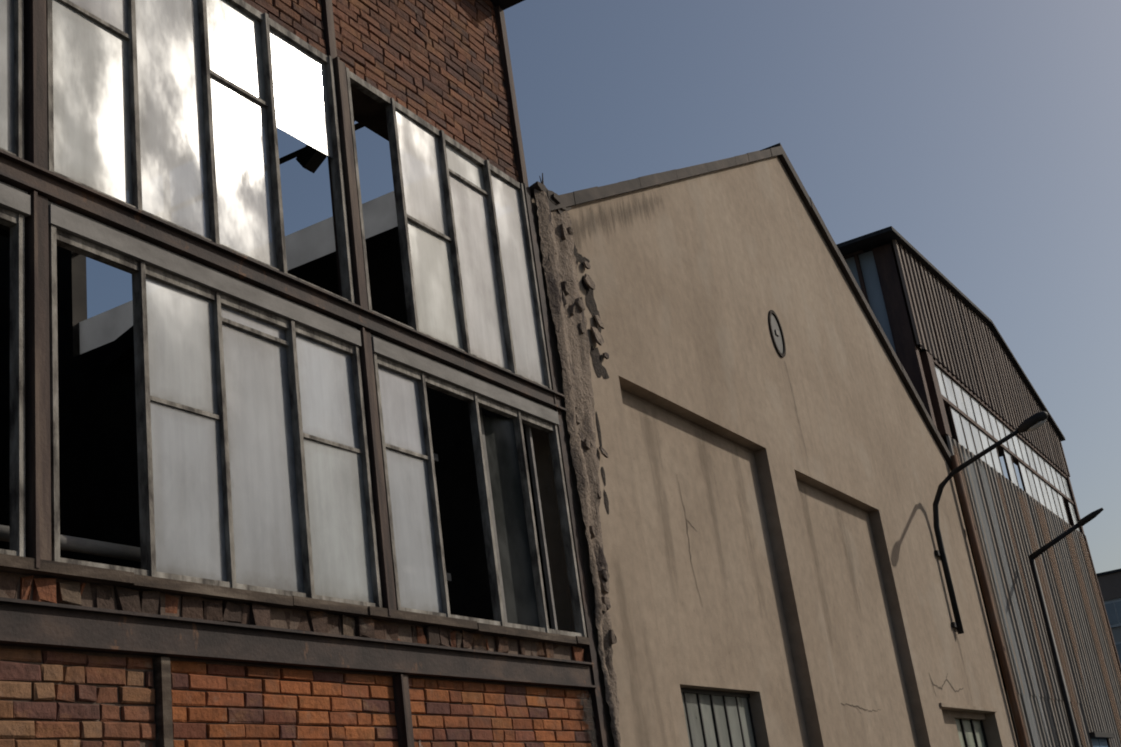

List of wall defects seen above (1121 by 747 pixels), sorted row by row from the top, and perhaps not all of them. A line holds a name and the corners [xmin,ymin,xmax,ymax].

flaking render [534,189,621,747]
crack [929,673,963,695]